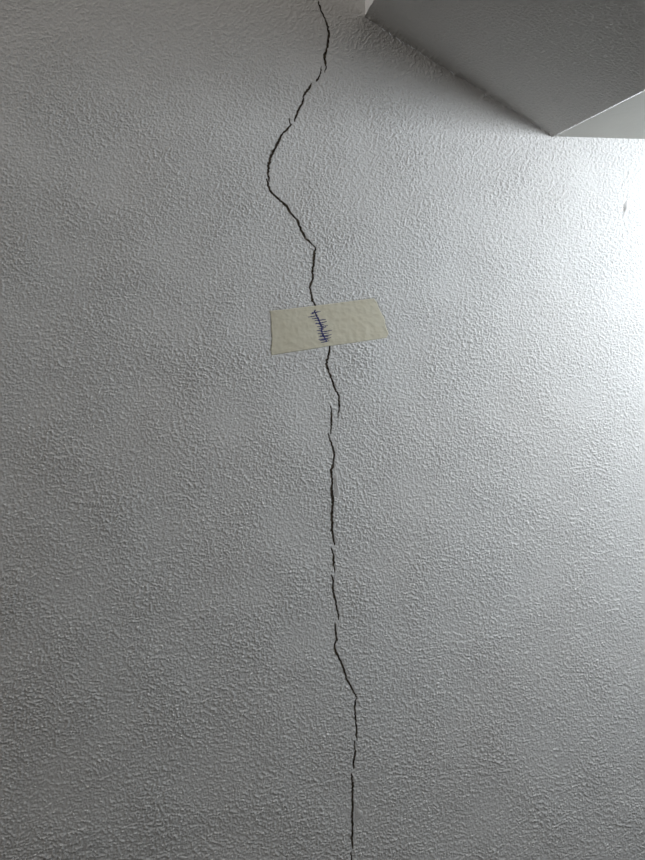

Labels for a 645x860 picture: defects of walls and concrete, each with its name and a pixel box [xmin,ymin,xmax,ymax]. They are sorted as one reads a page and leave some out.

crack [266,1,330,306]
crack [325,346,358,860]